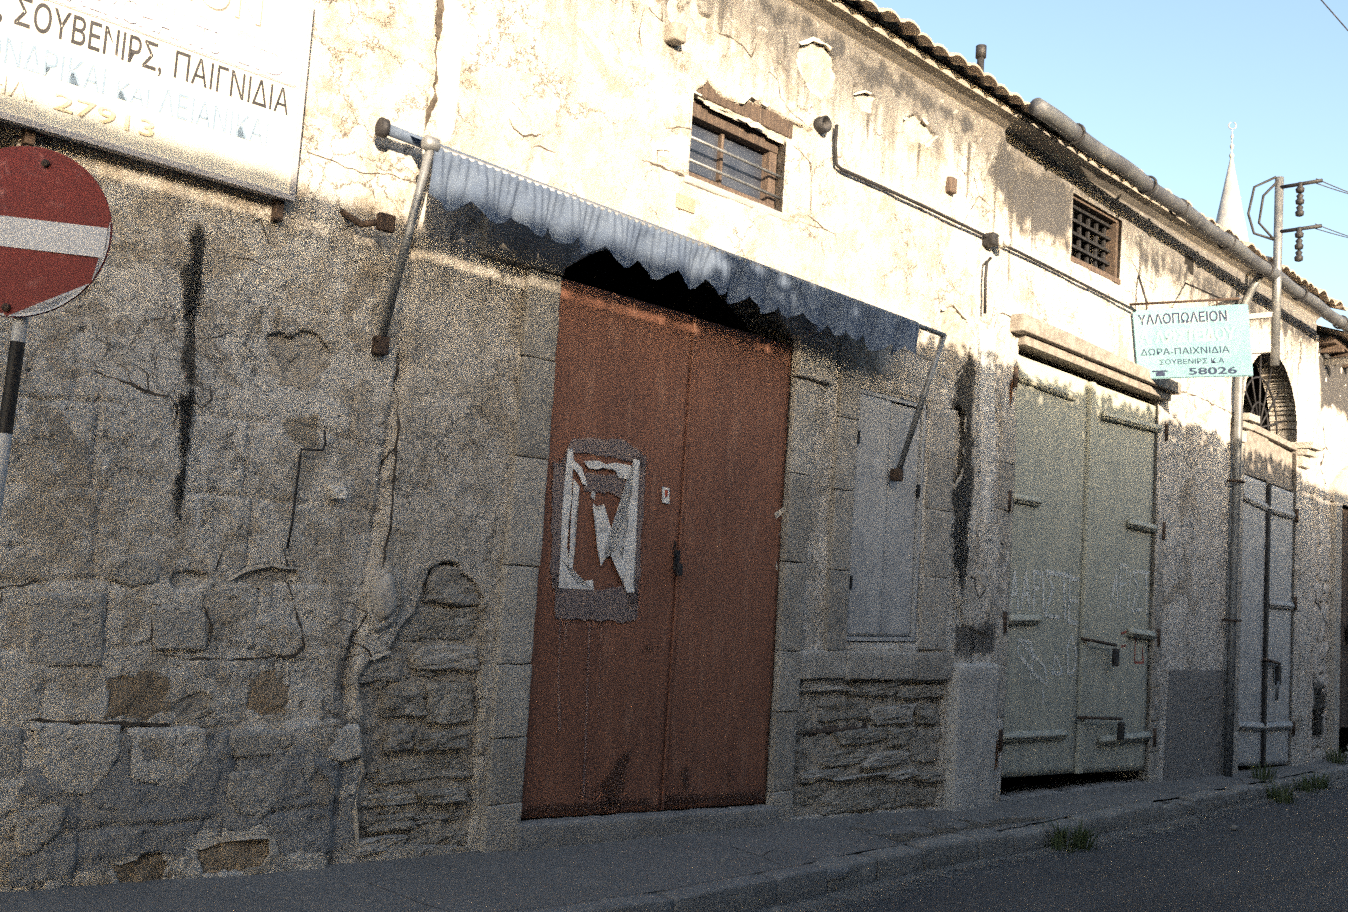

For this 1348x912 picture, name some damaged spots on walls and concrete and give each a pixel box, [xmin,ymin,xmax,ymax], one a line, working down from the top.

leakage [718,0,728,30]
leakage [761,0,844,58]
crack [425,0,445,129]
spalling [698,95,808,144]
leakage [858,61,973,199]
crack [93,312,235,425]
peeling [225,559,304,591]
spalling [241,667,289,716]
flaking render [0,671,218,854]
flaking render [310,696,379,844]
spalling [111,852,171,883]
spalling [193,835,280,875]